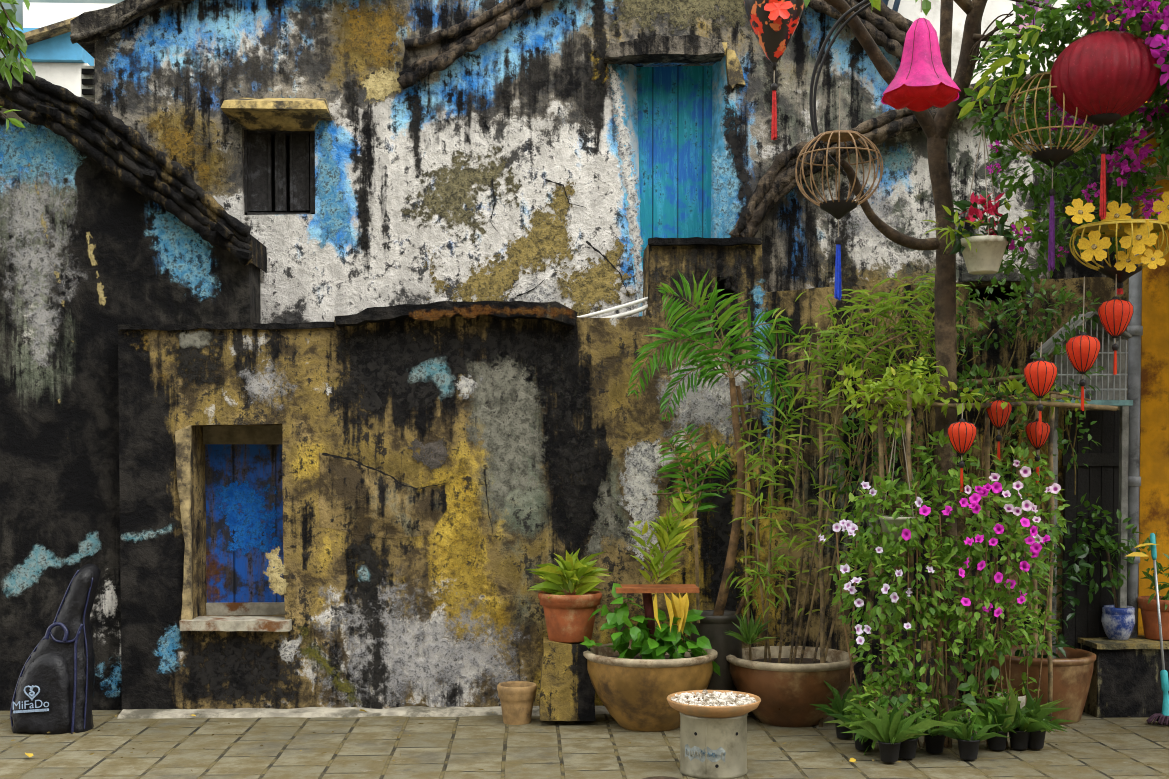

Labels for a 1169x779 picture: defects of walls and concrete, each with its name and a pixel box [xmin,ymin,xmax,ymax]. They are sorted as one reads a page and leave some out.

water stain [112,0,372,278]
peeling [317,120,353,248]
flaking render [401,144,522,245]
water stain [407,0,641,177]
flaking render [420,55,644,316]
water stain [326,317,600,536]